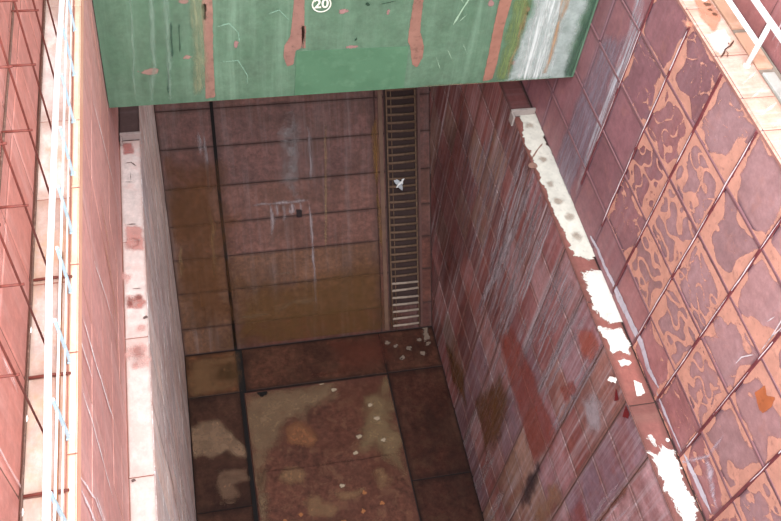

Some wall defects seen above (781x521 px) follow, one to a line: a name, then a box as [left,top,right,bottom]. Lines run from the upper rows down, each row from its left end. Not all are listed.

peeling [695,0,720,31]
peeling [520,17,781,521]
peeling [502,329,553,455]
corrosion [755,386,775,413]
corrosion [287,424,316,446]